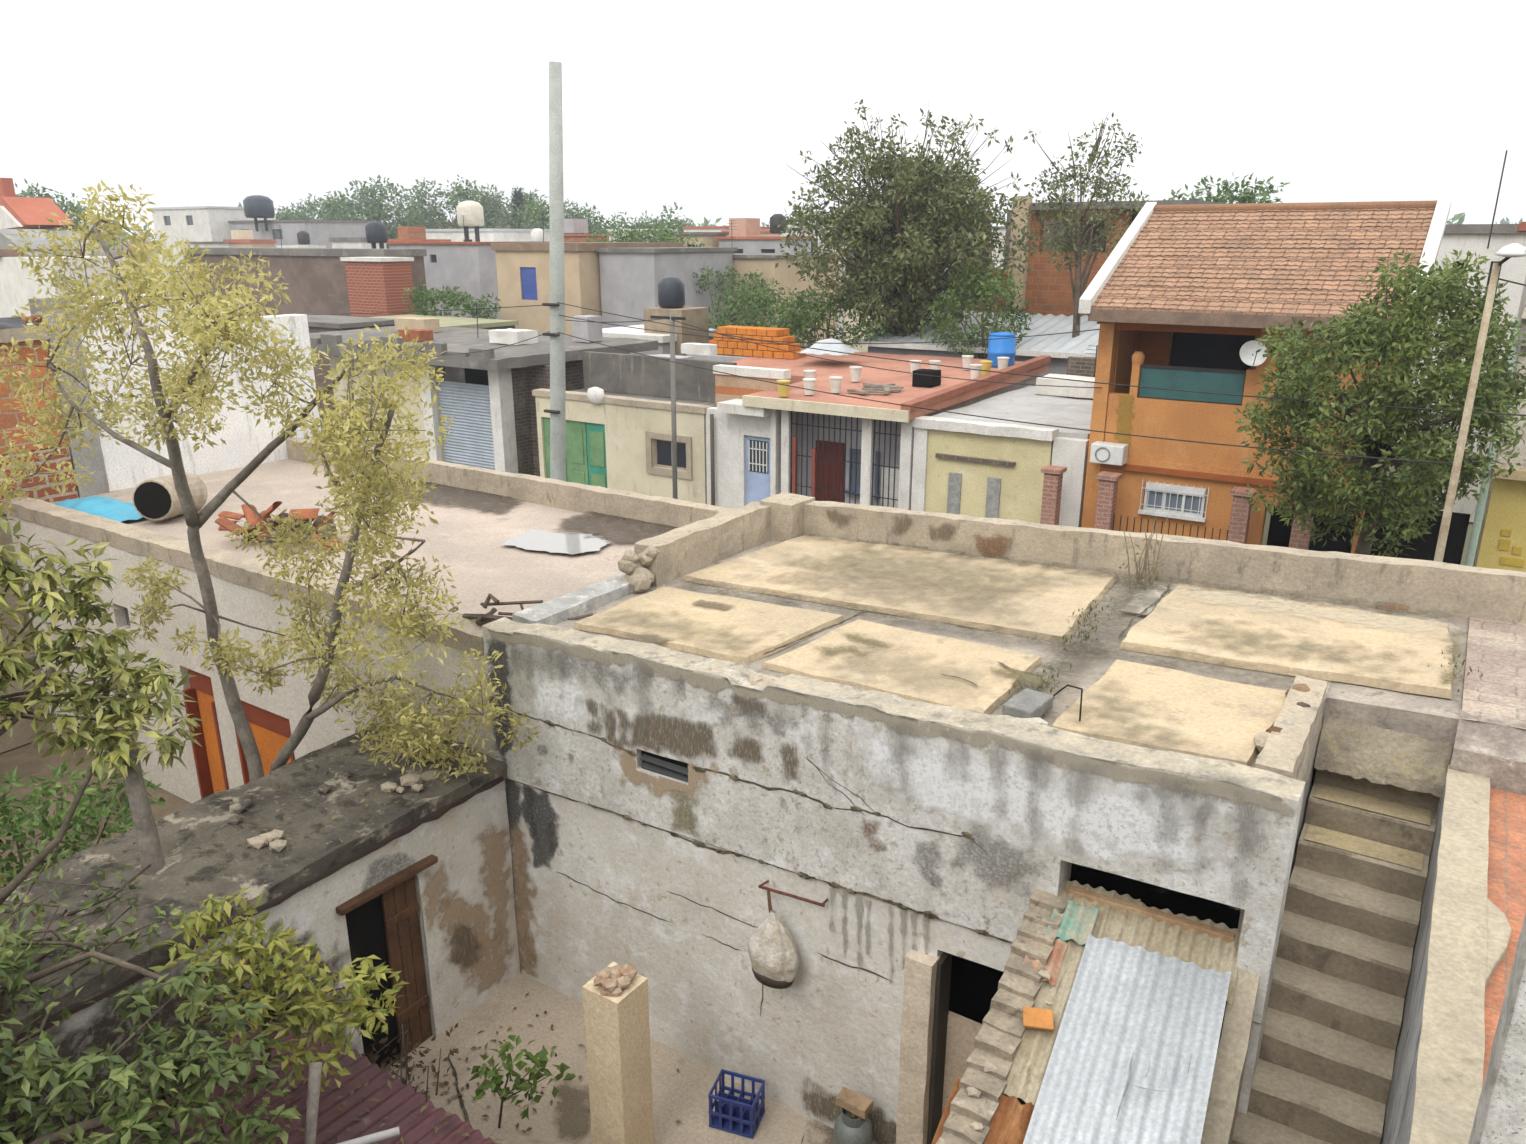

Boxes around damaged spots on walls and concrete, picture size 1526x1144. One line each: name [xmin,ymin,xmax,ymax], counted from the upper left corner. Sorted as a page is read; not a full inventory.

crack [500,705,637,756]
leakage [487,640,780,868]
leakage [782,744,797,779]
crack [692,759,988,854]
leakage [917,831,1037,895]
leakage [452,925,480,968]
leakage [830,888,871,966]
leakage [889,907,929,983]